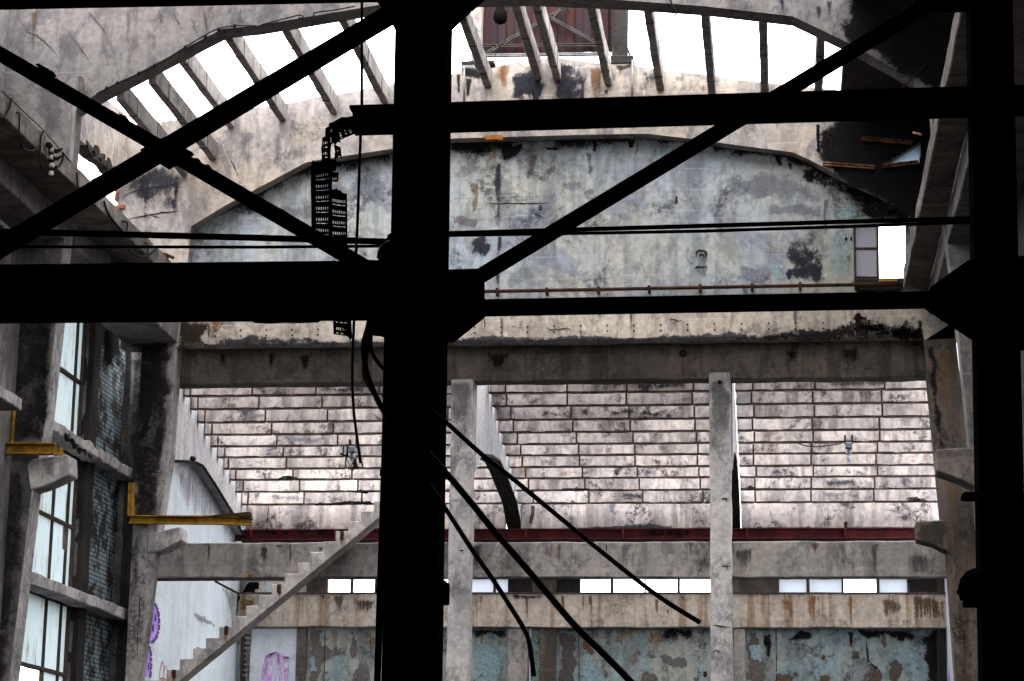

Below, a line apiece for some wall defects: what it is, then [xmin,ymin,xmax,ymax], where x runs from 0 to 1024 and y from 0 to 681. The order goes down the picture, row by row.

leakage [512,63,585,99]
leakage [816,124,836,170]
leakage [129,167,181,219]
leakage [730,155,828,282]
leakage [455,311,924,368]
peeling [307,628,375,681]
peeling [745,630,796,681]
peeling [849,650,905,681]